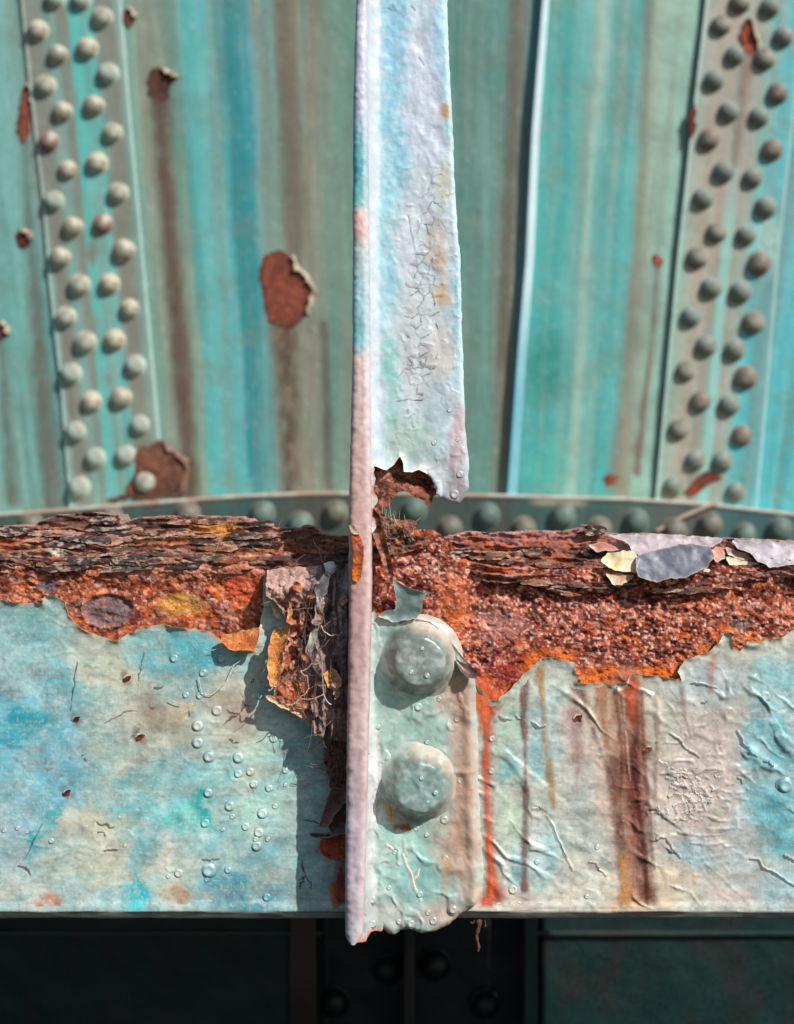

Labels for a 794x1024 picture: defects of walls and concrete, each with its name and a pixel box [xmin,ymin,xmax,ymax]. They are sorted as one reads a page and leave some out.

peeling [740,17,761,54]
peeling [16,81,32,142]
peeling [259,250,317,329]
crack [397,172,444,427]
peeling [107,439,192,504]
corrosion [0,205,794,952]
peeling [589,533,794,585]
peeling [221,561,349,861]